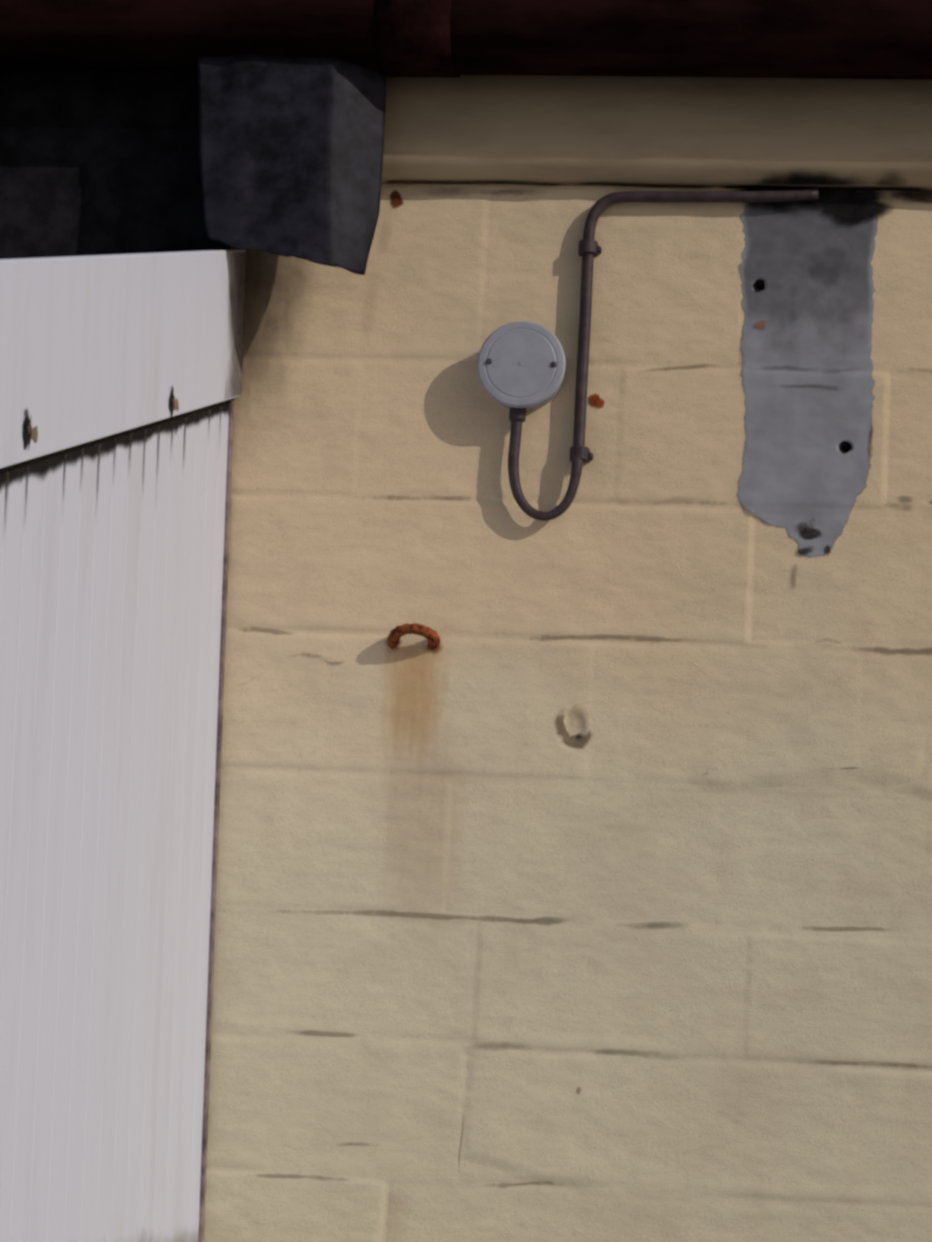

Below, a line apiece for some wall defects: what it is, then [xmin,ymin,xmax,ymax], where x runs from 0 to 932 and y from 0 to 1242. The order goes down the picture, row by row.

damp [722,174,924,224]
peeling [737,203,877,557]
spalling [556,704,591,748]